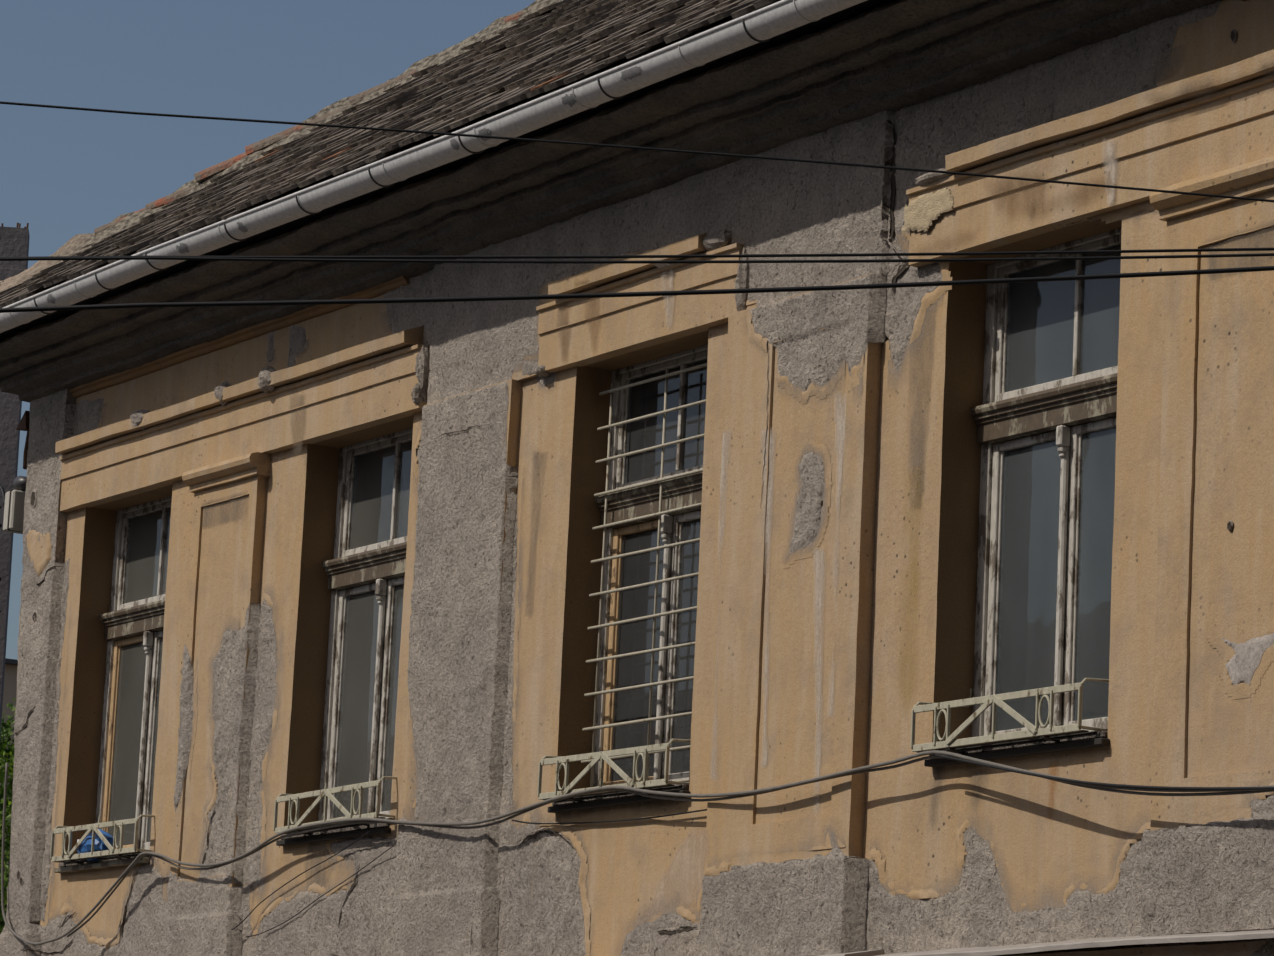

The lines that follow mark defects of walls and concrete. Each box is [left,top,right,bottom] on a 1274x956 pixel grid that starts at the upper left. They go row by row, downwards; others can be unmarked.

flaking render [384,1,1220,404]
flaking render [0,299,591,956]
flaking render [781,438,833,569]
flaking render [620,780,1274,956]